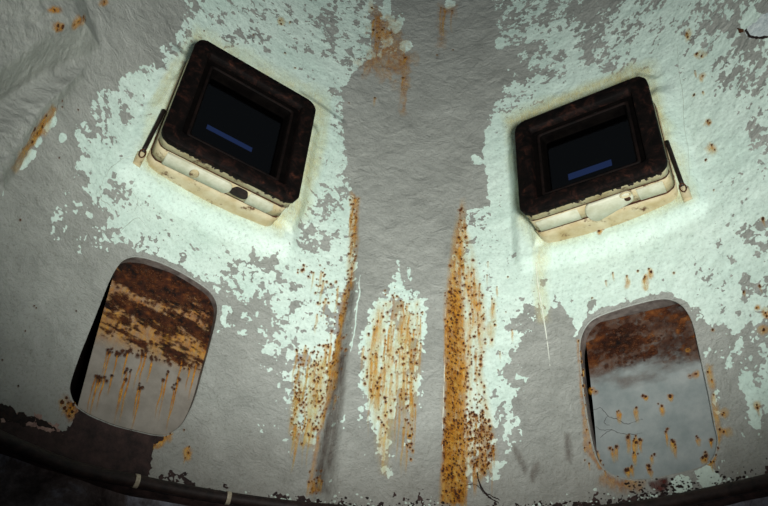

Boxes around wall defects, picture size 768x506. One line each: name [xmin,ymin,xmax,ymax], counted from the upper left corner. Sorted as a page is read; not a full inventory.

peeling [206,0,279,54]
peeling [669,0,768,99]
peeling [296,213,341,257]
peeling [694,259,768,304]
peeling [715,214,768,262]
corrosion [88,262,214,419]
corrosion [291,197,359,494]
corrosion [363,287,423,460]
corrosion [441,207,496,503]
spalling [585,347,596,441]
corrosion [578,304,700,405]
corrosion [610,434,642,486]